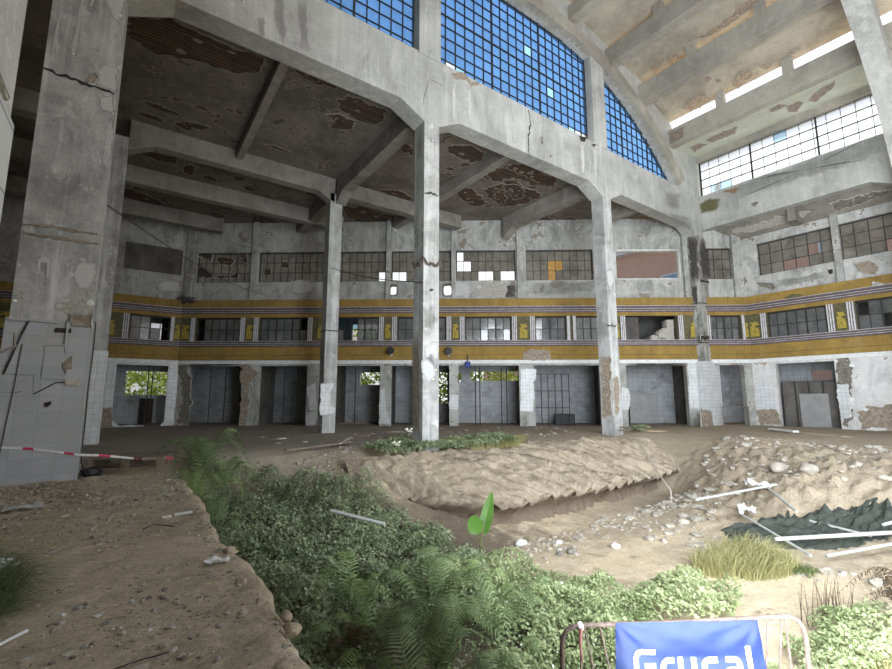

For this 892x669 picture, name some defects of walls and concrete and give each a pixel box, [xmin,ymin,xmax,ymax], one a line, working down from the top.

spalling [107,0,265,74]
spalling [0,73,10,101]
crack [43,67,114,95]
spalling [291,67,387,130]
spalling [457,163,558,208]
spalling [20,224,100,245]
spalling [176,364,193,426]
spalling [238,364,258,426]
flaking render [834,358,892,430]